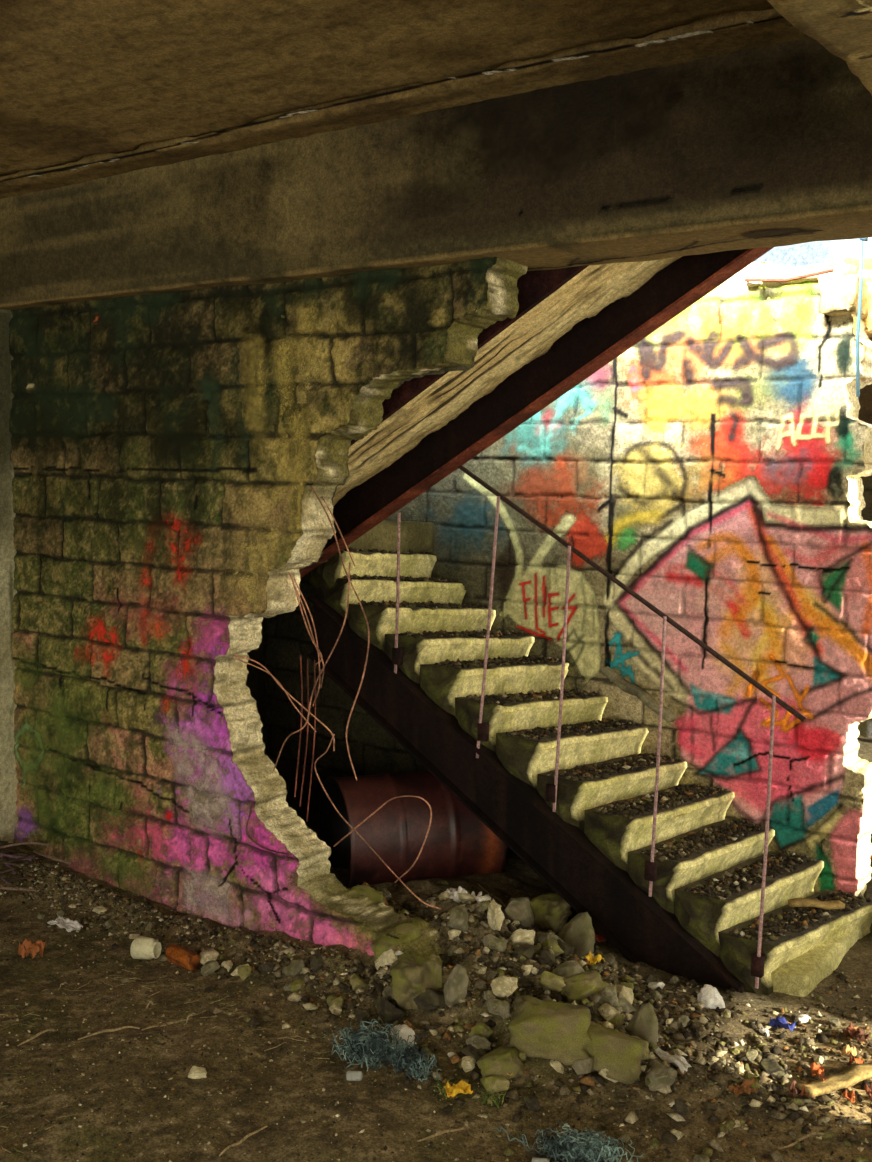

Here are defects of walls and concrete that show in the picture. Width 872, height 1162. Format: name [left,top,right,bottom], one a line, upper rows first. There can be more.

crack [856,0,872,12]
crack [0,16,784,182]
crack [731,185,762,194]
crack [601,197,669,210]
spalling [230,528,280,600]